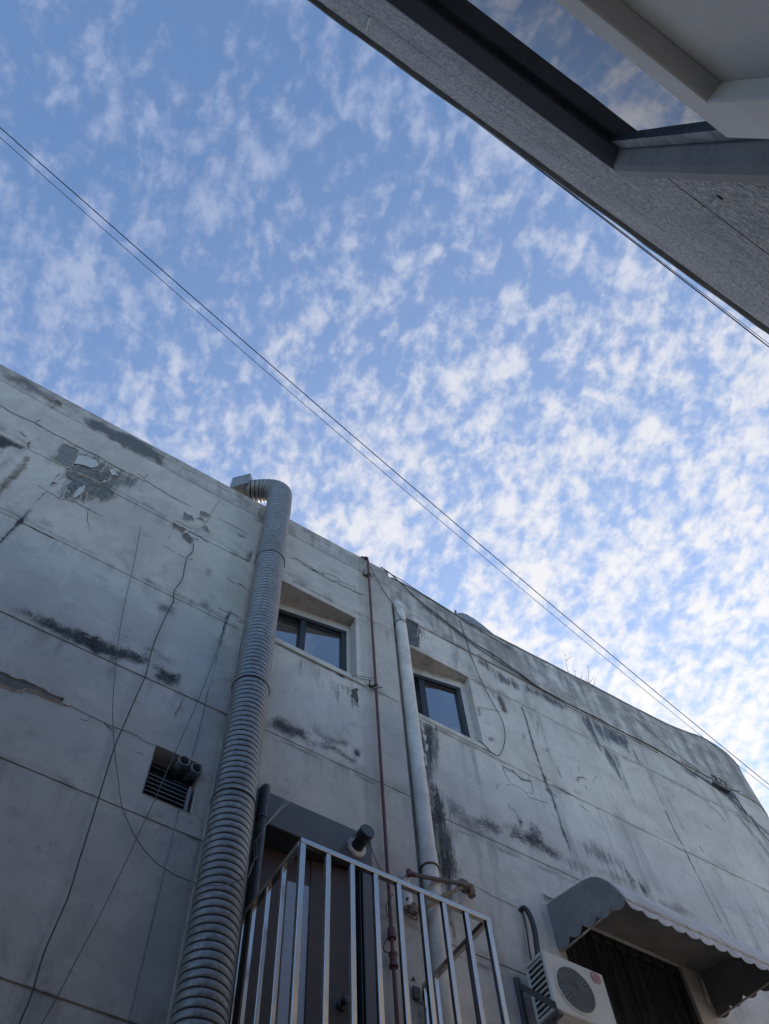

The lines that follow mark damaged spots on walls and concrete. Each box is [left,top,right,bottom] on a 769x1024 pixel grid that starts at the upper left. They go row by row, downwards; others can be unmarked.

leakage [86,420,163,464]
peeling [49,444,135,503]
peeling [170,503,218,543]
leakage [29,612,180,685]
spalling [0,671,71,706]
leakage [273,718,314,744]
leakage [582,717,628,773]
crack [476,686,595,850]
leakage [513,821,555,855]